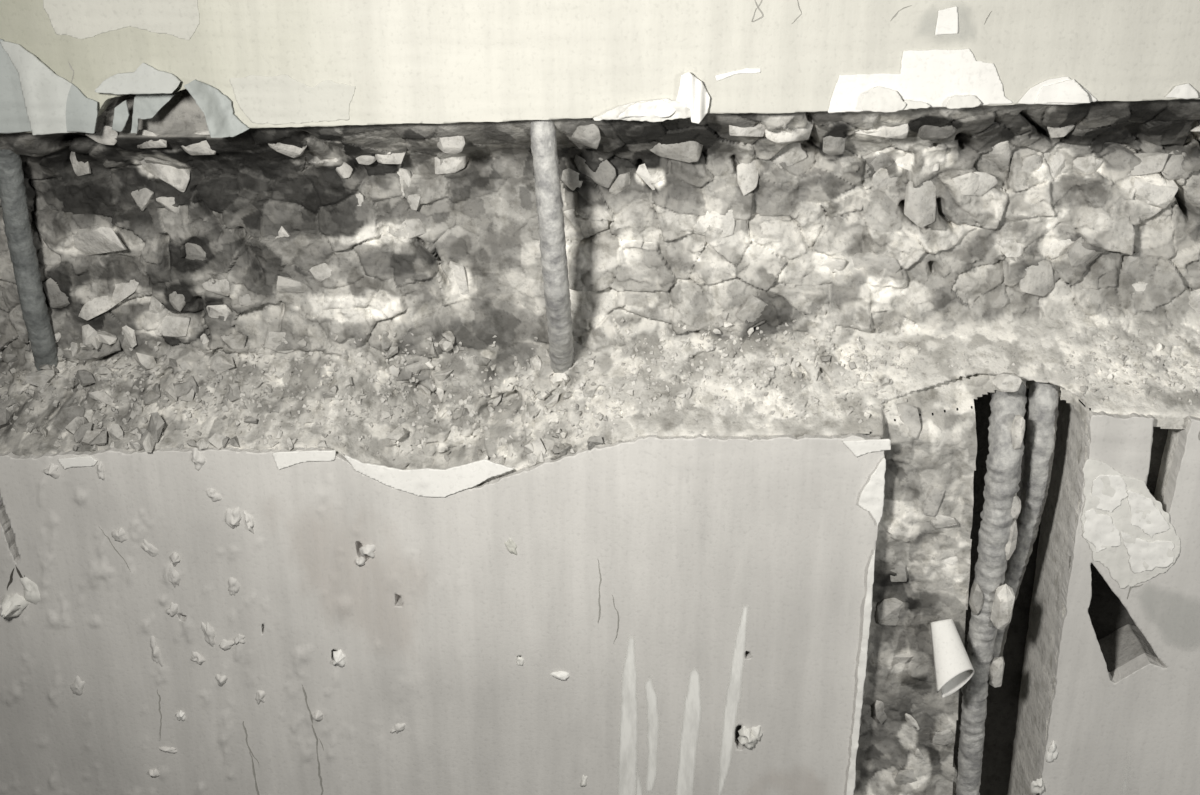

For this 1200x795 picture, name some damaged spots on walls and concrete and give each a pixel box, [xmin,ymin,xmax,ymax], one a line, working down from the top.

peeling [935,6,959,35]
spalling [0,49,1200,497]
crack [7,567,25,590]
spalling [843,404,977,795]
peeling [1075,446,1181,672]
leakage [618,637,659,795]
leakage [676,669,701,795]
leakage [718,606,748,795]